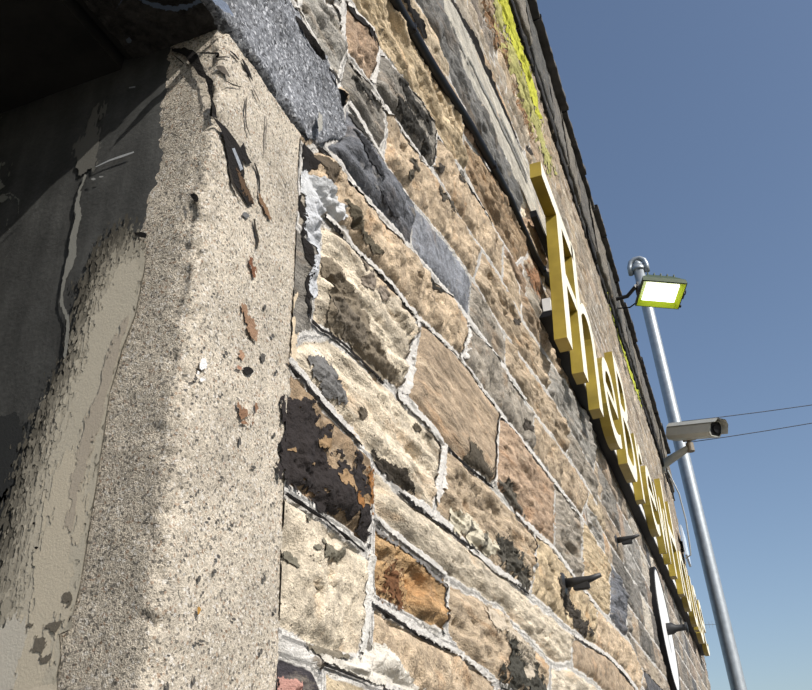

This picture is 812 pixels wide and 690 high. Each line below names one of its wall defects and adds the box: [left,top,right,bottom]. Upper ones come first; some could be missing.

spalling [212,116,253,218]
water stain [451,21,533,182]